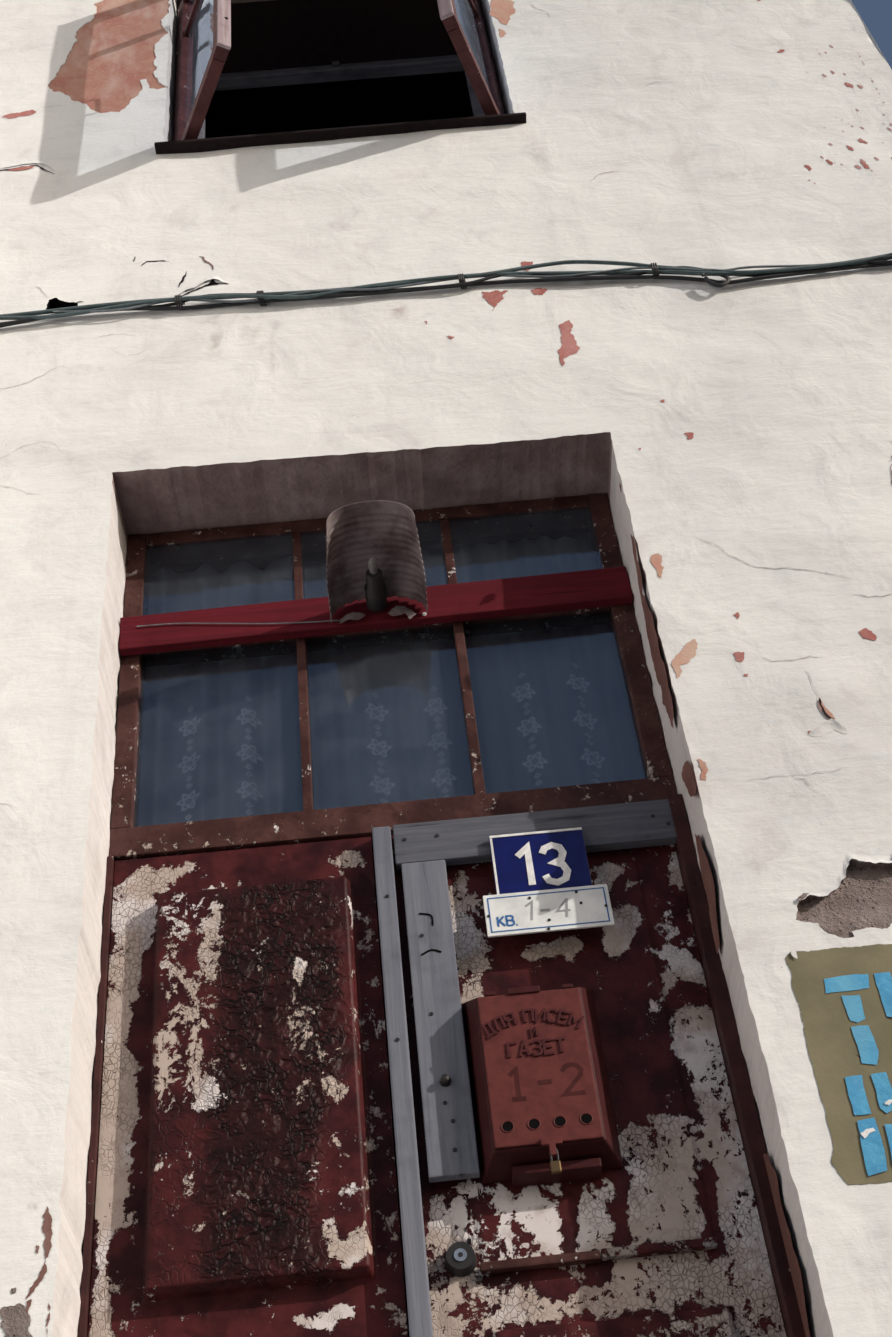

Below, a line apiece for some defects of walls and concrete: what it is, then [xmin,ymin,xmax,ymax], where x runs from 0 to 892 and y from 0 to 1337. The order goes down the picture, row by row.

peeling [490,0,515,38]
peeling [48,0,171,113]
peeling [804,53,892,184]
spalling [34,286,83,309]
peeling [482,290,508,311]
peeling [558,320,580,366]
crack [701,539,891,597]
peeling [631,535,698,727]
peeling [681,759,708,797]
spalling [796,852,892,938]
peeling [0,1207,53,1337]